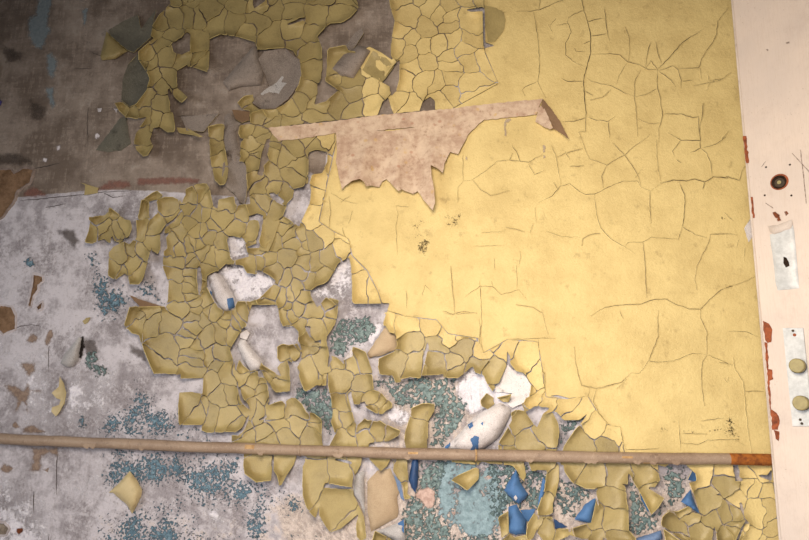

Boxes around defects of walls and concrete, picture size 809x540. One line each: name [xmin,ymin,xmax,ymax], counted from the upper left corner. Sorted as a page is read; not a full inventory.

spalling [0,166,35,220]
crack [323,193,357,248]
crack [395,205,409,255]
crack [442,0,764,452]
spalling [0,304,17,336]
spalling [27,272,44,313]
peeling [85,0,624,540]
spalling [763,321,780,441]
peeling [452,460,779,540]
spalling [0,520,11,537]